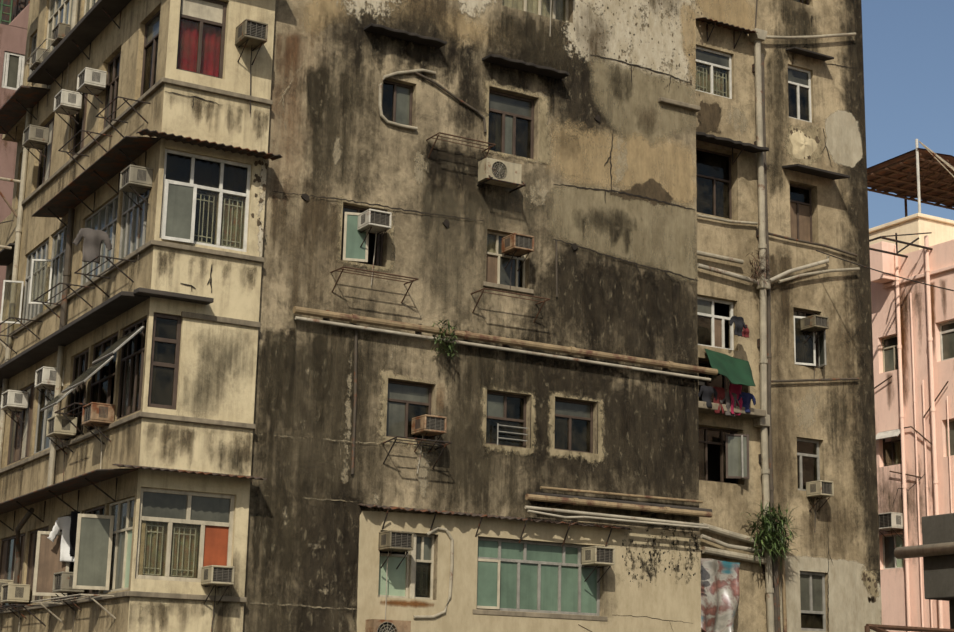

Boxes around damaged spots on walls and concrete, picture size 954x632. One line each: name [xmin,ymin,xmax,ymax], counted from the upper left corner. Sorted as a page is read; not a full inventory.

flaking render [306,0,520,47]
damp [273,0,631,302]
crack [554,129,694,210]
peeling [561,0,755,90]
damp [218,314,402,632]
damp [415,138,702,583]